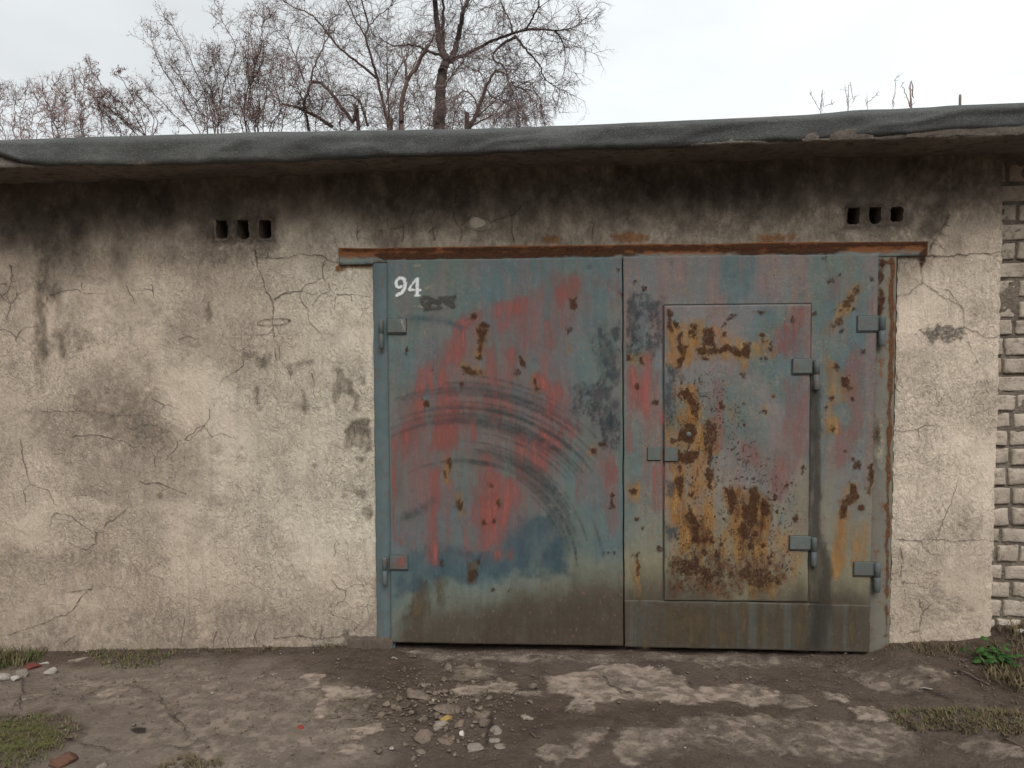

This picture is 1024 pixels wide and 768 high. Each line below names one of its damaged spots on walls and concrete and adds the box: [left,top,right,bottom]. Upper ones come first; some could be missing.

crack [251,250,367,375]
flaking render [920,325,964,343]
crack [906,217,996,364]
crack [21,409,221,550]
corrosion [336,232,928,637]